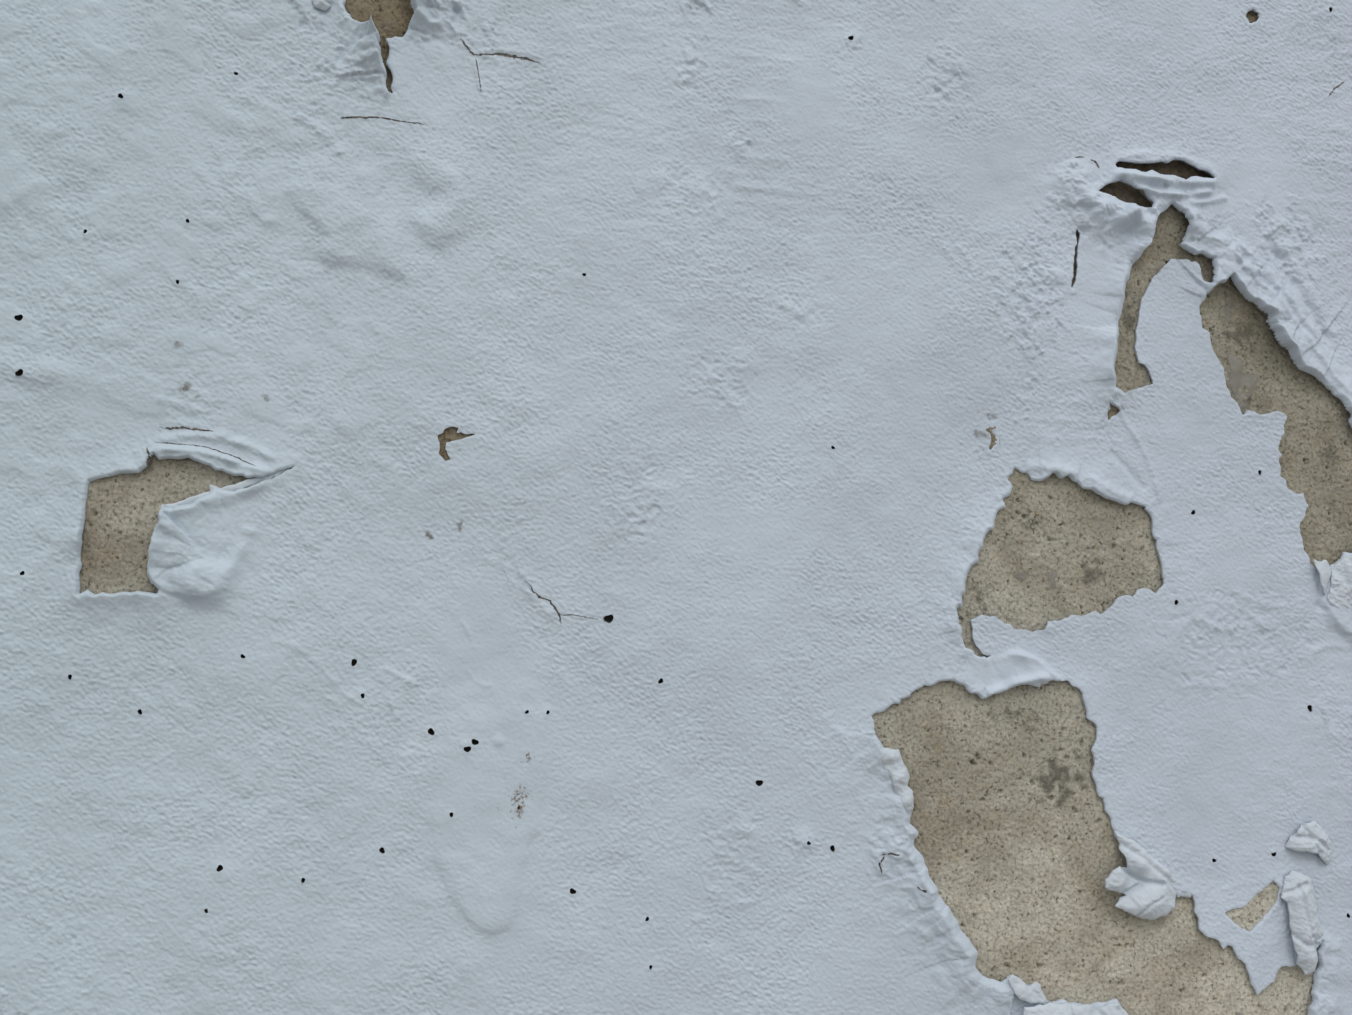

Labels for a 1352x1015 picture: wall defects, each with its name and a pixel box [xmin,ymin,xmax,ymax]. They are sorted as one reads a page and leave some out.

peeling [312,0,450,127]
peeling [44,423,328,625]
peeling [834,422,1352,1015]
peeling [1086,189,1352,629]